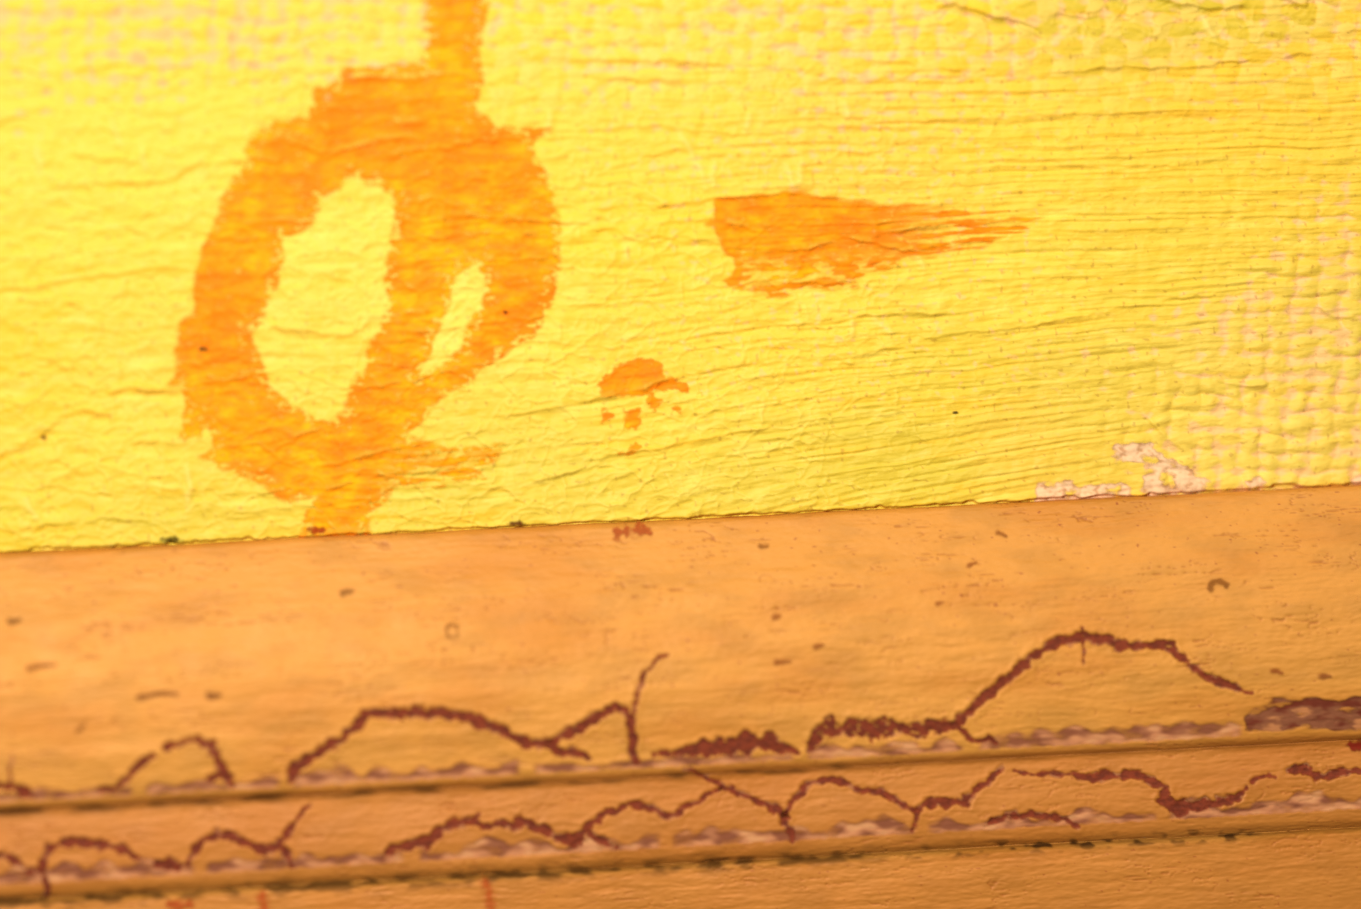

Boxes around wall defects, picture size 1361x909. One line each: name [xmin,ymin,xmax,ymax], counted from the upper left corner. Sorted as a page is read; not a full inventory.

peeling [1035,442,1208,501]
crack [0,627,1361,897]